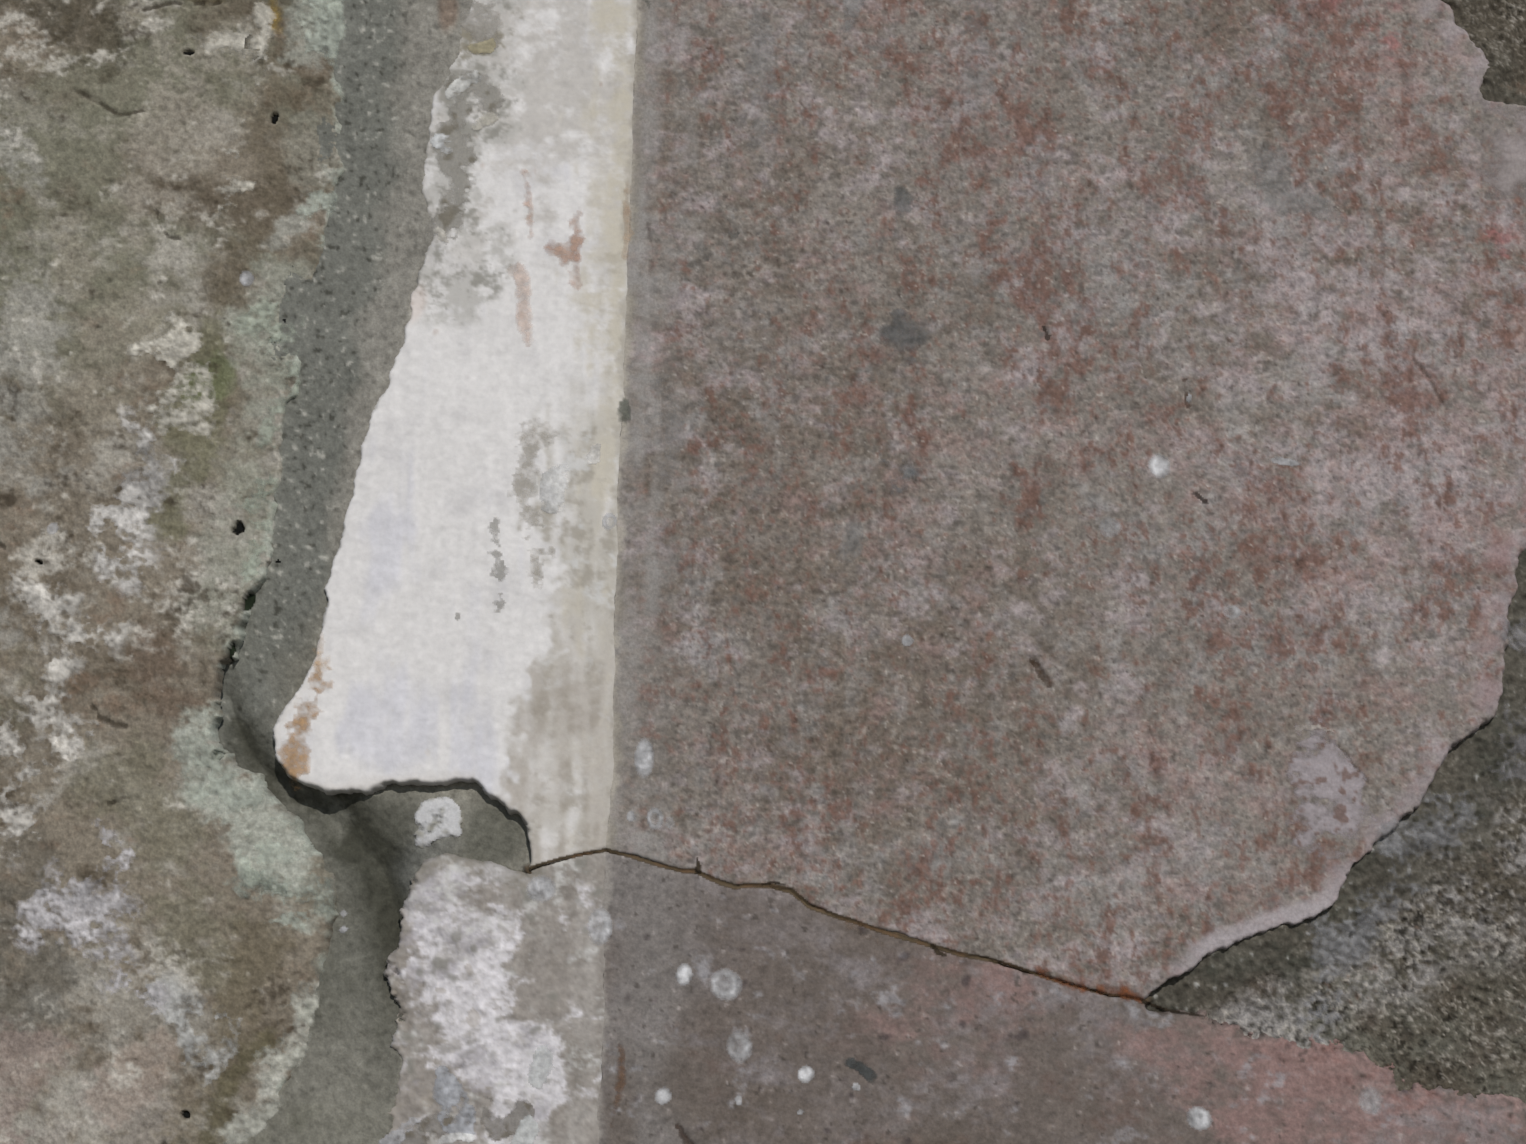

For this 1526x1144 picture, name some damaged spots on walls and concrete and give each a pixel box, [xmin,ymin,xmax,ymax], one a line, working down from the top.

flaking render [1441,0,1526,195]
flaking render [218,0,570,1144]
rust [283,674,321,780]
flaking render [1144,549,1526,1103]
crack [529,848,1202,1016]